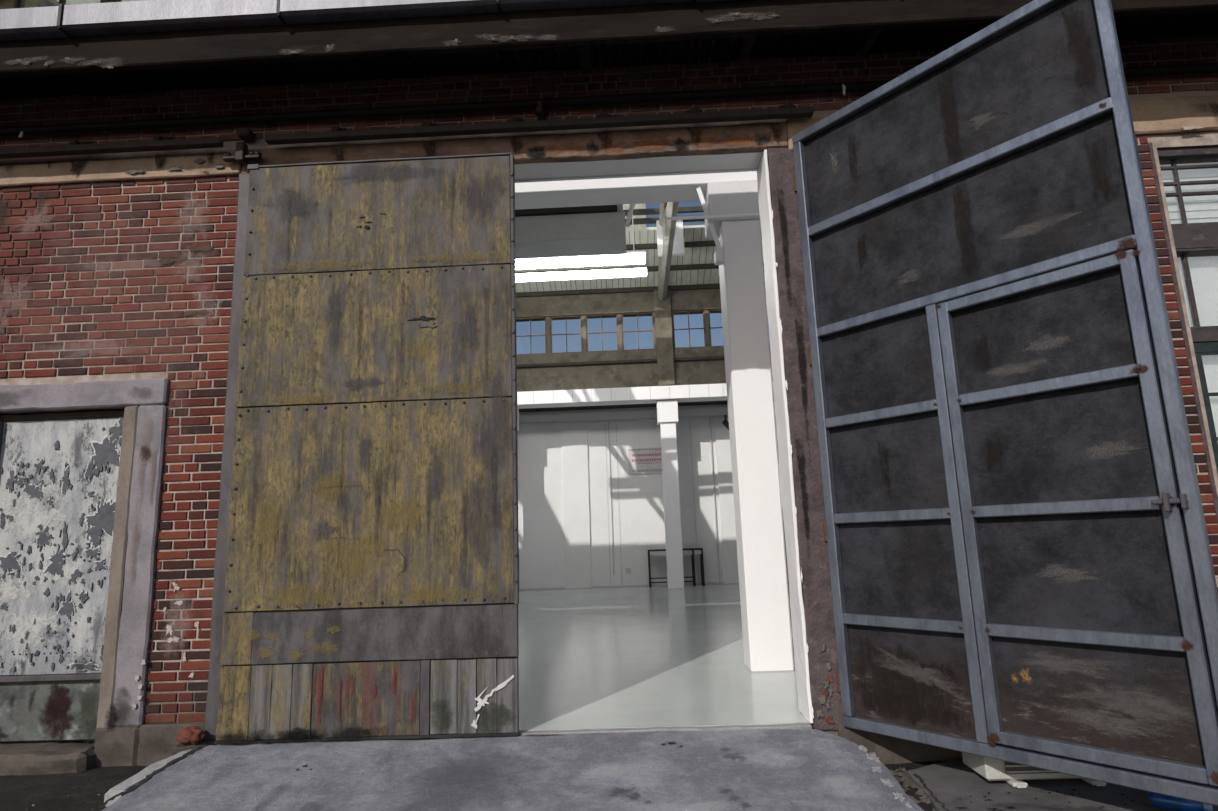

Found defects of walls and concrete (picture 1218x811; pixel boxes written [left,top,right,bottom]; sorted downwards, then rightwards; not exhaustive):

peeling [0,417,124,674]